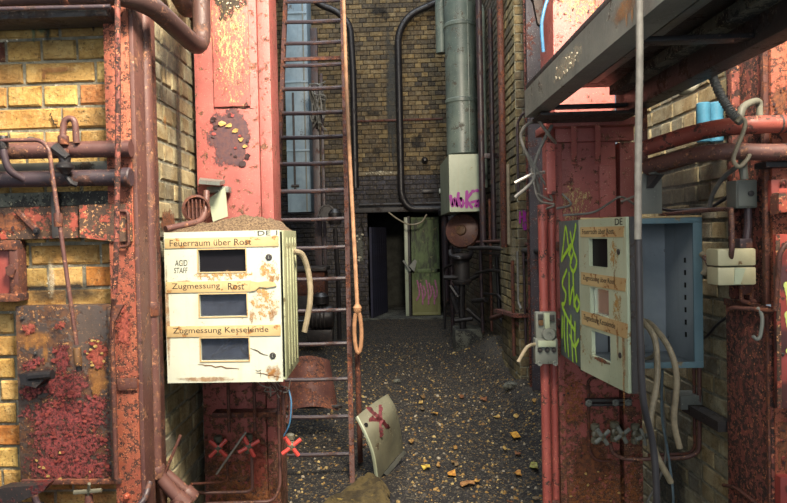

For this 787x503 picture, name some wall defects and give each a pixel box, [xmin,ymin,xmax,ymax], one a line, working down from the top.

peeling [206,0,252,167]
rust [772,85,787,114]
rust [23,333,48,360]
rust [91,365,107,396]
rust [206,453,282,503]